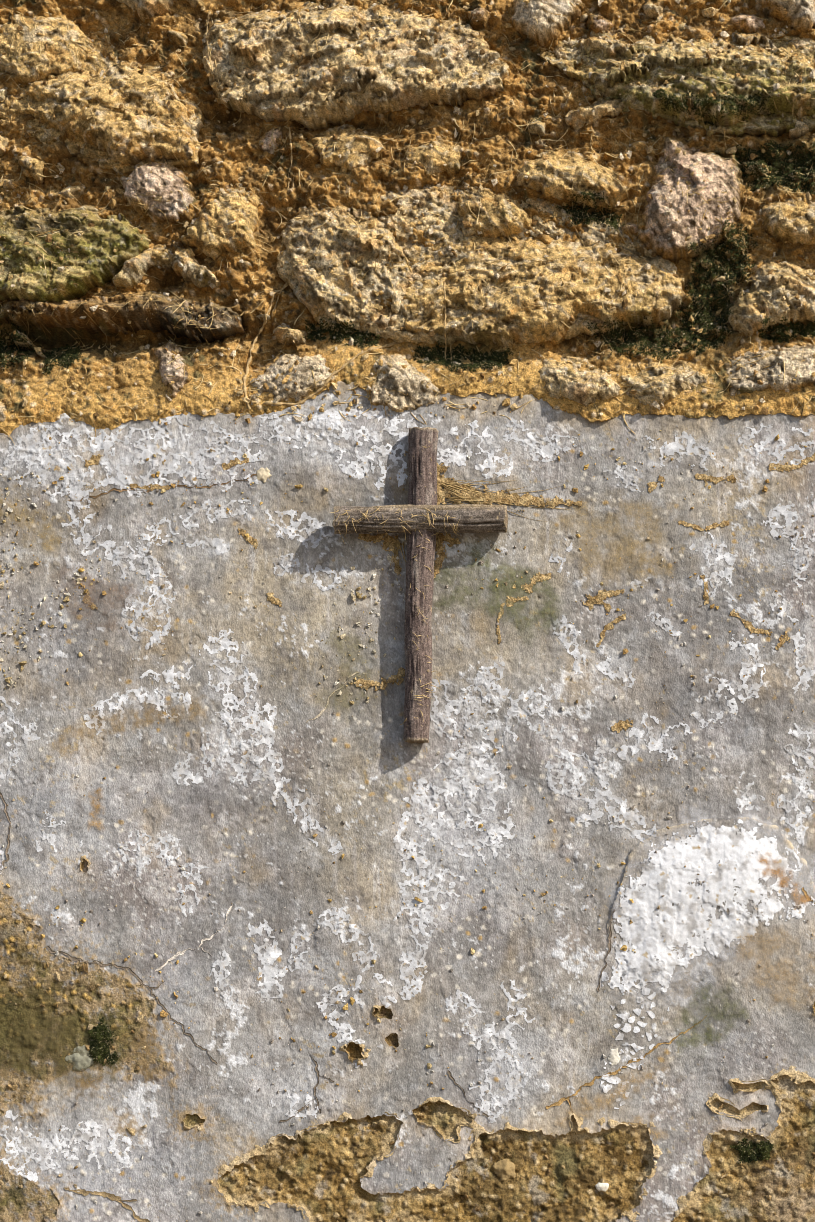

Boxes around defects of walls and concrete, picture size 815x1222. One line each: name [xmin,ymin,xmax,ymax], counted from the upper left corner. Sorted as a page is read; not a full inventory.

spalling [209,632,815,1222]
peeling [769,591,815,694]